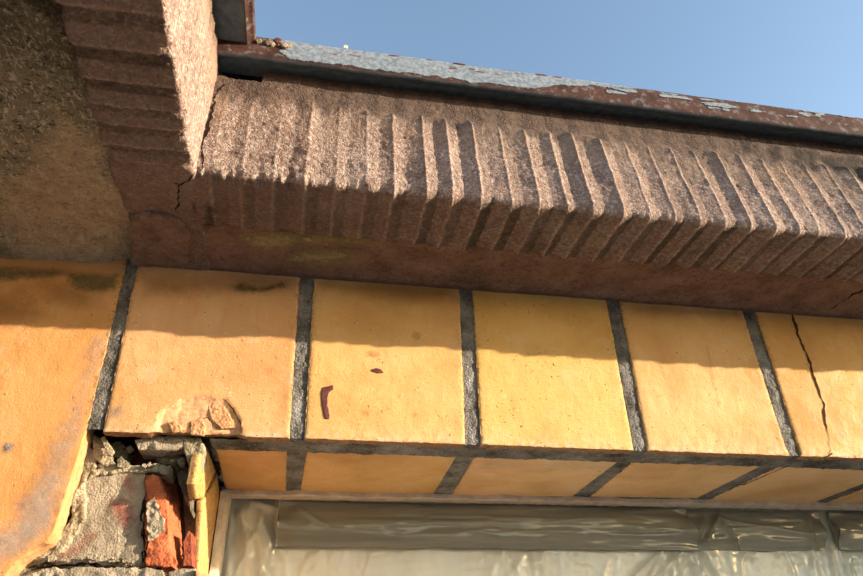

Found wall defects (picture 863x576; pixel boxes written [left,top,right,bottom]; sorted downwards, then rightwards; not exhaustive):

crack [174,84,225,211]
damp [0,268,116,290]
crack [791,314,833,460]
spalling [19,396,241,576]